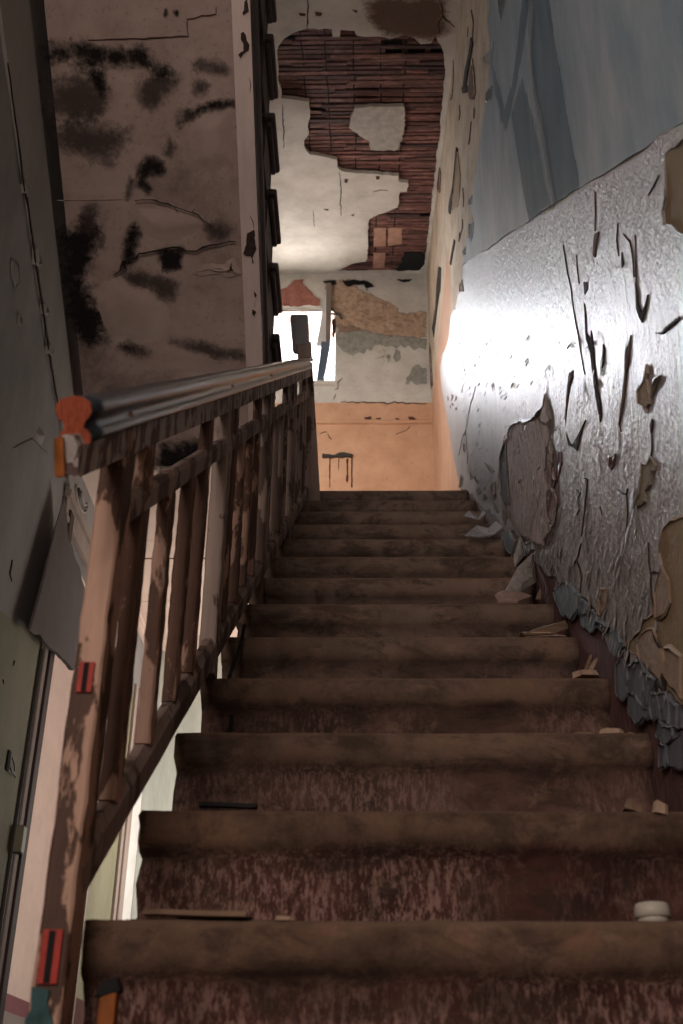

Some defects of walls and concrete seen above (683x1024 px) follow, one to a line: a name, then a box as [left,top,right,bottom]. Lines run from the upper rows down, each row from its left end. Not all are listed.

crack [96,7,217,40]
leakage [366,0,446,41]
leakage [40,41,178,165]
leakage [177,82,234,123]
leakage [57,206,107,347]
leakage [126,141,175,197]
leakage [122,223,184,300]
crack [114,199,254,275]
flaking render [277,28,474,389]
peeling [662,138,683,236]
leakage [176,341,244,360]
flaking render [448,282,683,771]